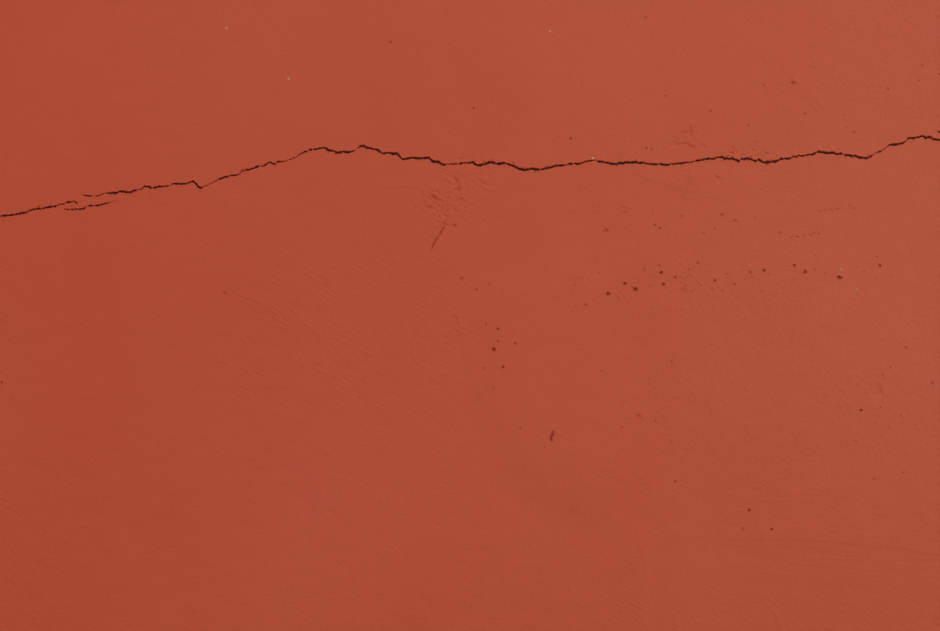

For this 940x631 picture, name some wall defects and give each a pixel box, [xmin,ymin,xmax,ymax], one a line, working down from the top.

crack [0,128,940,220]